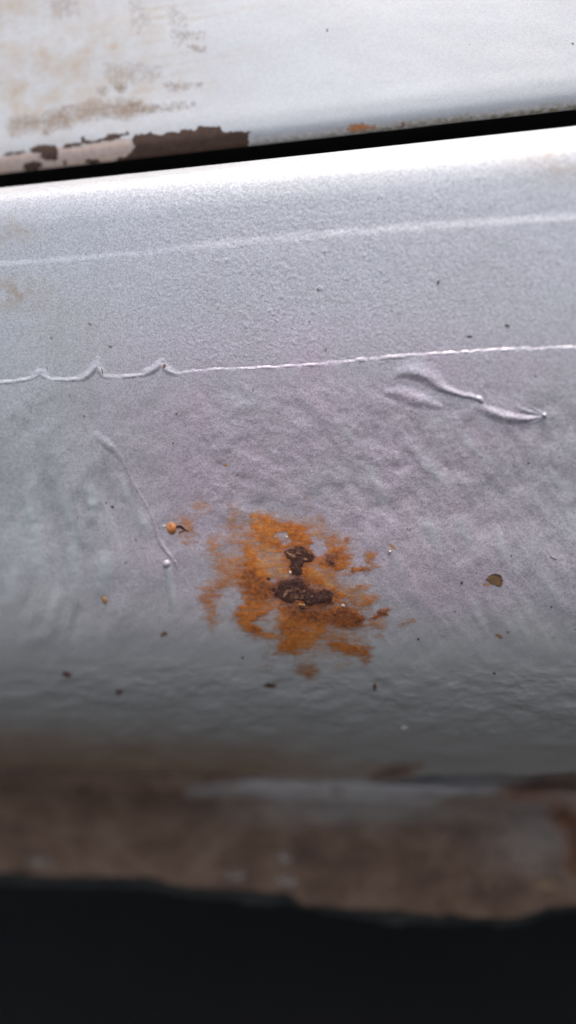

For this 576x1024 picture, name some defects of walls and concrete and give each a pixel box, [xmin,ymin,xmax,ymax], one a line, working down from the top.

peeling [0,126,250,174]
corrosion [201,513,391,677]